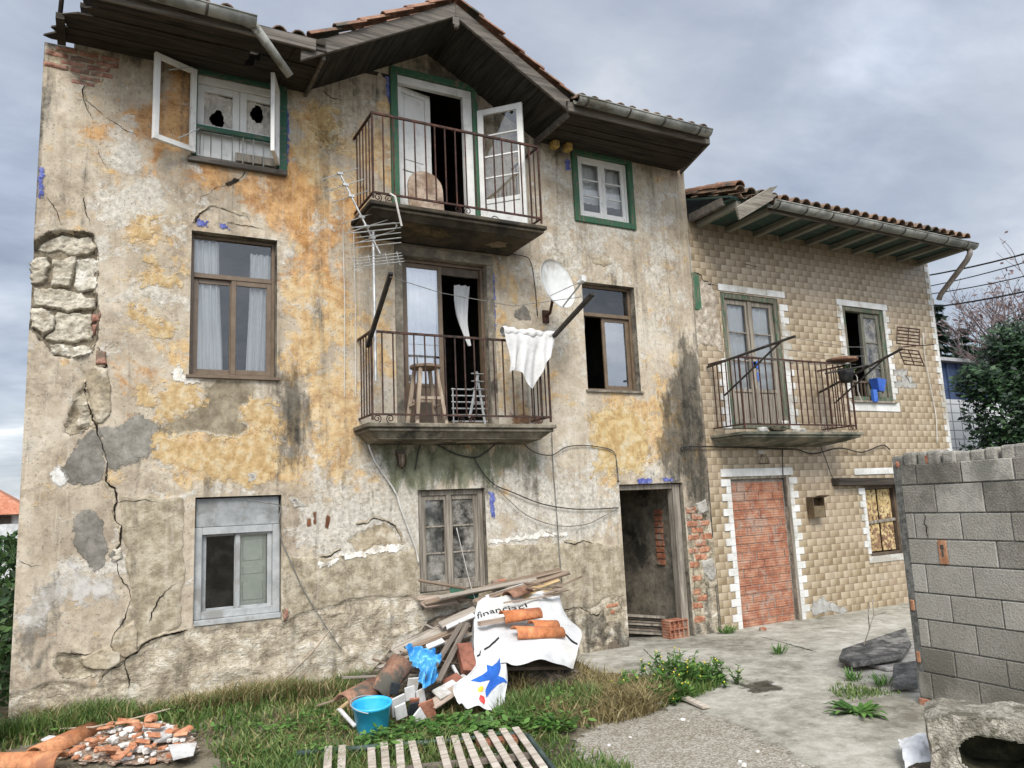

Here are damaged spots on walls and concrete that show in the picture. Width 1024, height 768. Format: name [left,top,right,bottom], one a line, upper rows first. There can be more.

spalling [43,46,119,87]
crack [82,85,133,133]
crack [192,171,257,228]
spalling [29,230,107,365]
crack [63,304,188,687]
flaking render [317,522,405,569]
flaking render [488,530,568,545]
spalling [686,499,716,625]